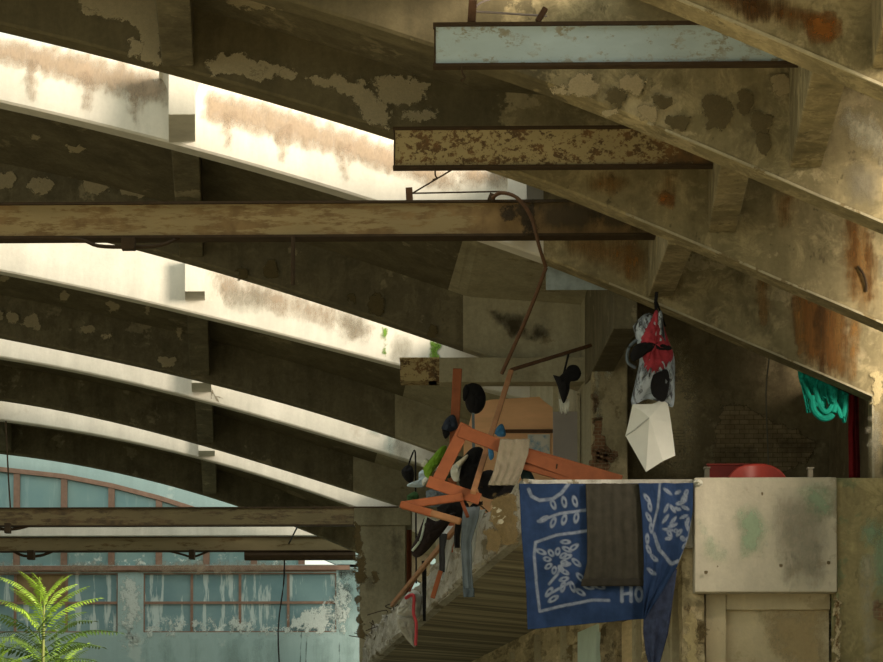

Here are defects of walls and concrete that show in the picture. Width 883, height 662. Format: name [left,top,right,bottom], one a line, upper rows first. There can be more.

peeling [78,0,162,67]
rust [721,0,841,40]
water stain [0,42,167,113]
peeling [205,52,438,132]
water stain [207,93,394,173]
water stain [410,171,454,187]
water stain [465,171,508,184]
rust [848,221,872,300]
rust [792,295,858,376]
water stain [870,371,883,406]
peeling [118,521,380,651]